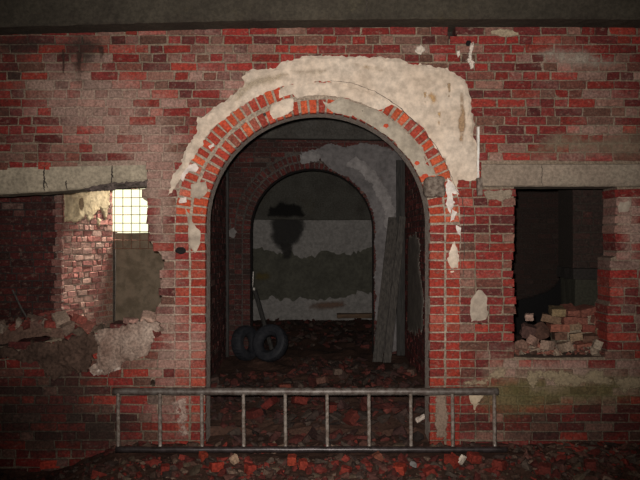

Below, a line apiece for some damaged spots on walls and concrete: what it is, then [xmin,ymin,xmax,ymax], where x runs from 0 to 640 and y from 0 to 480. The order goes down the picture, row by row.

peeling [64,180,148,226]
damp [268,203,304,217]
peeling [168,55,477,336]
damp [253,244,372,301]
peeling [470,290,488,322]
spalling [89,319,161,376]